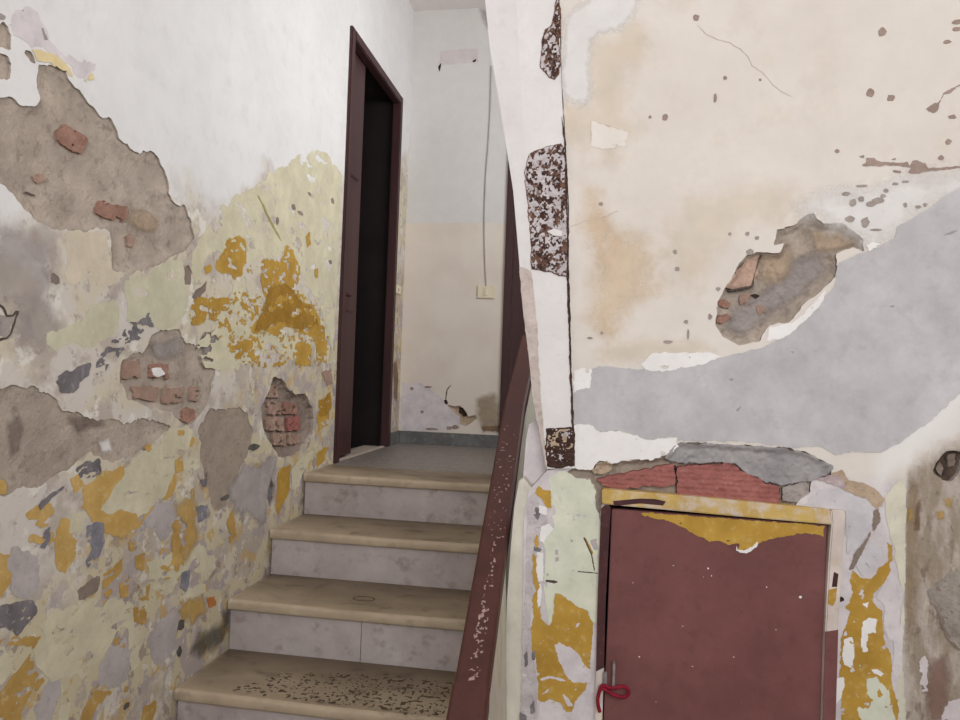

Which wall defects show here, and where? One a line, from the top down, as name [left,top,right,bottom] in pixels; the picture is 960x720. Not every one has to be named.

rust [540,0,561,80]
crack [700,27,792,97]
rust [524,143,568,277]
flaking render [708,173,960,346]
peeling [0,6,343,720]
peeling [400,382,477,432]
rust [545,427,574,468]
flaking render [519,267,834,720]
peeling [836,477,912,720]
flaking render [928,572,960,651]
flaking render [919,656,960,720]